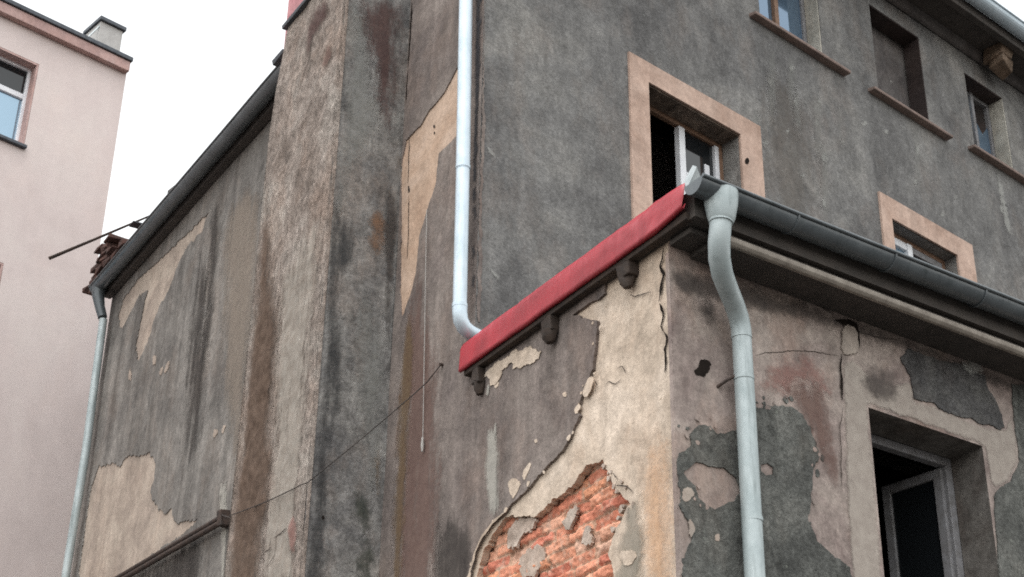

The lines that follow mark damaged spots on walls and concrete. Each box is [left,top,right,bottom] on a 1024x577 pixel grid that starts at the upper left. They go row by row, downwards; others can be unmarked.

flaking render [79,453,196,577]
flaking render [119,217,206,375]
water stain [187,196,315,577]
flaking render [401,69,458,316]
flaking render [467,241,744,577]
crack [632,248,668,373]
crack [755,304,897,490]
flaking render [756,348,1024,577]